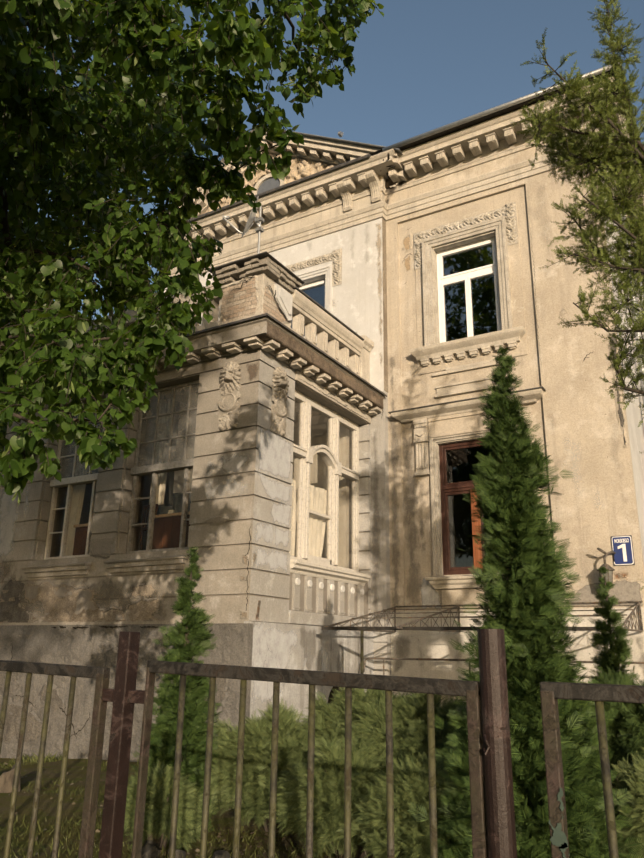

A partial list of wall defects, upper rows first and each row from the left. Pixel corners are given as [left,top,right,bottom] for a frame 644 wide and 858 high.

spalling [218,275,383,409]
flaking render [0,577,31,623]
crack [240,527,251,615]